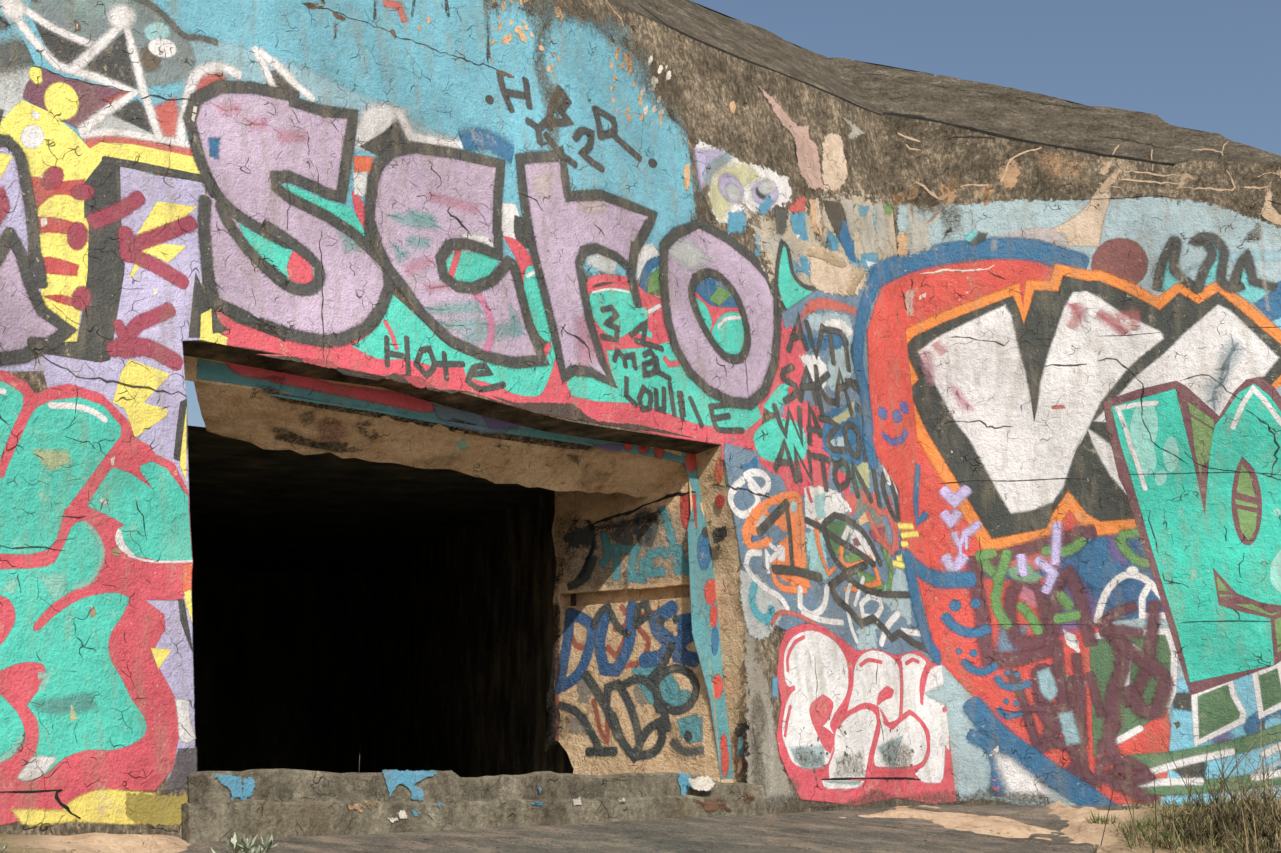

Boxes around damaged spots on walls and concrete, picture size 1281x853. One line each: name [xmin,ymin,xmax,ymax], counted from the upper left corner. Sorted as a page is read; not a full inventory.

crack [606,0,1281,225]
peeling [758,86,1004,309]
peeling [979,160,1026,206]
peeling [904,288,939,317]
spalling [261,355,467,393]
spalling [490,395,694,438]
crack [1045,332,1281,480]
crack [1145,509,1190,588]
crack [1182,608,1270,640]